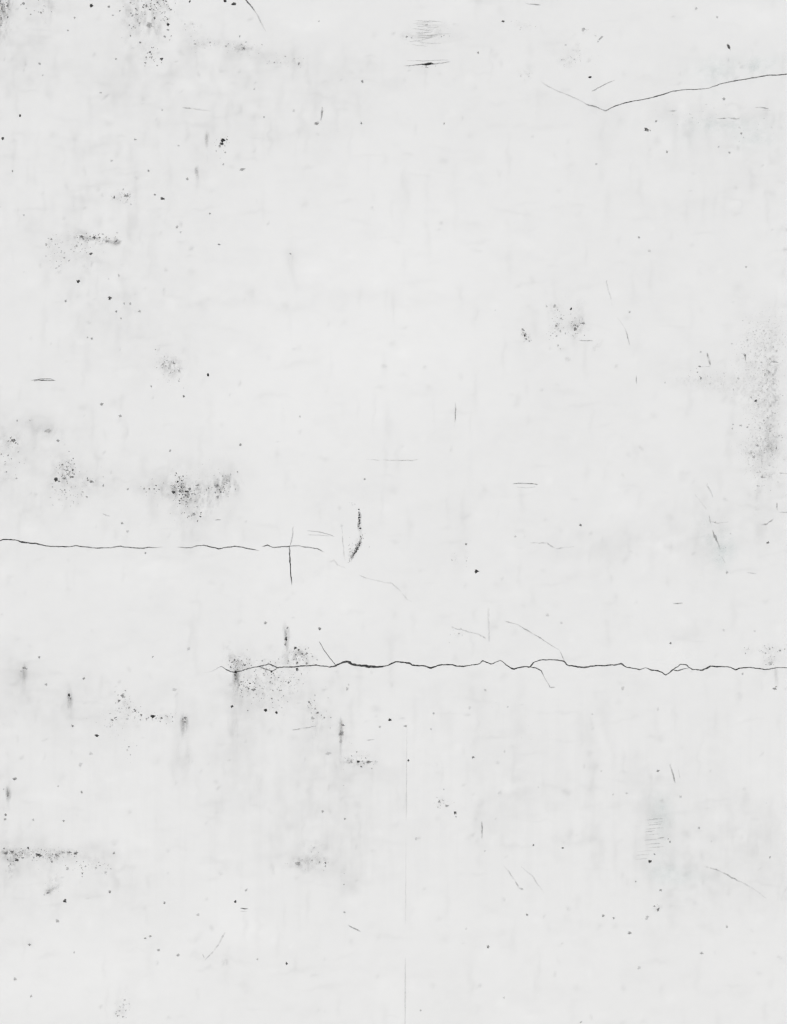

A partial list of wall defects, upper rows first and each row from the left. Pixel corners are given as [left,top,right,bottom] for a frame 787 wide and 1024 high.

crack [0,539,150,549]
crack [188,545,319,580]
crack [226,659,771,675]